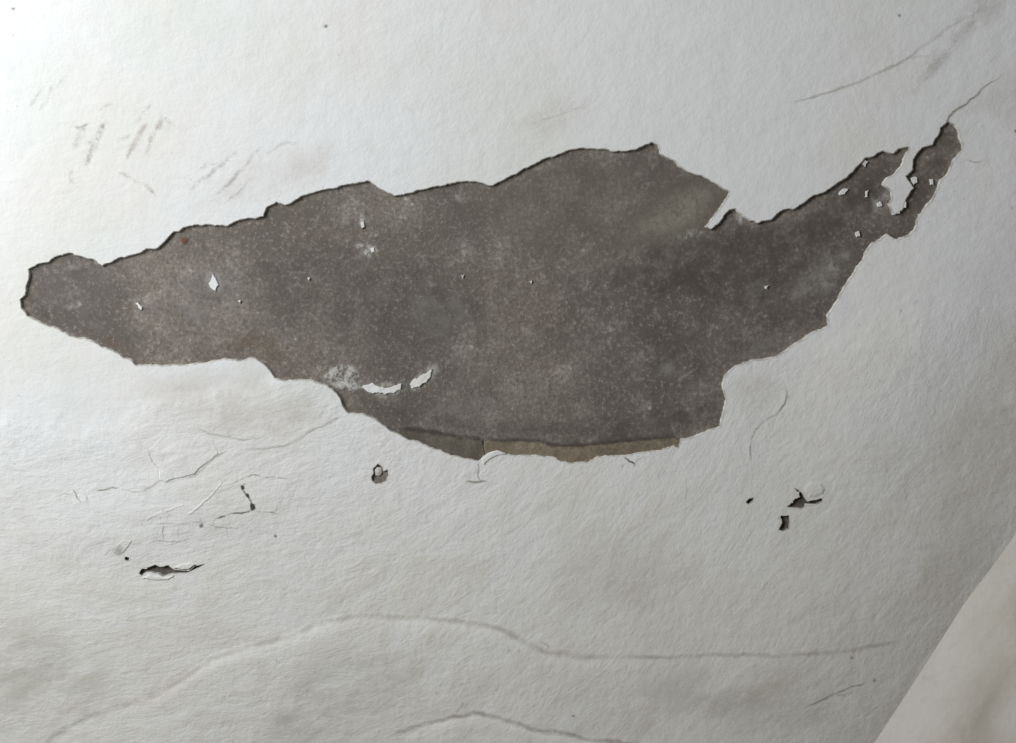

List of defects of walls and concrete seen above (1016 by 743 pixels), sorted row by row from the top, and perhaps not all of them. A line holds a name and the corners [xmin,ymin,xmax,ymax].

crack [947,92,979,122]
flaking render [20,121,964,464]
peeling [371,464,389,484]
peeling [777,482,825,531]
peeling [114,540,132,561]
peeling [139,562,204,580]